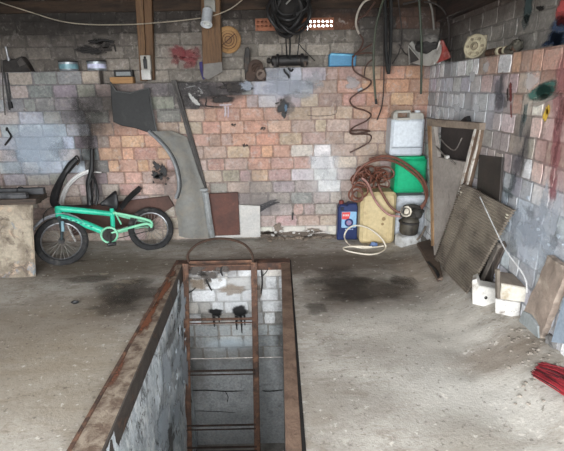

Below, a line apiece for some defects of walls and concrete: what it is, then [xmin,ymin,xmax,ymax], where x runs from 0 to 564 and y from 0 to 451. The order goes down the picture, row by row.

corrosion [138,270,176,333]
corrosion [222,285,244,295]